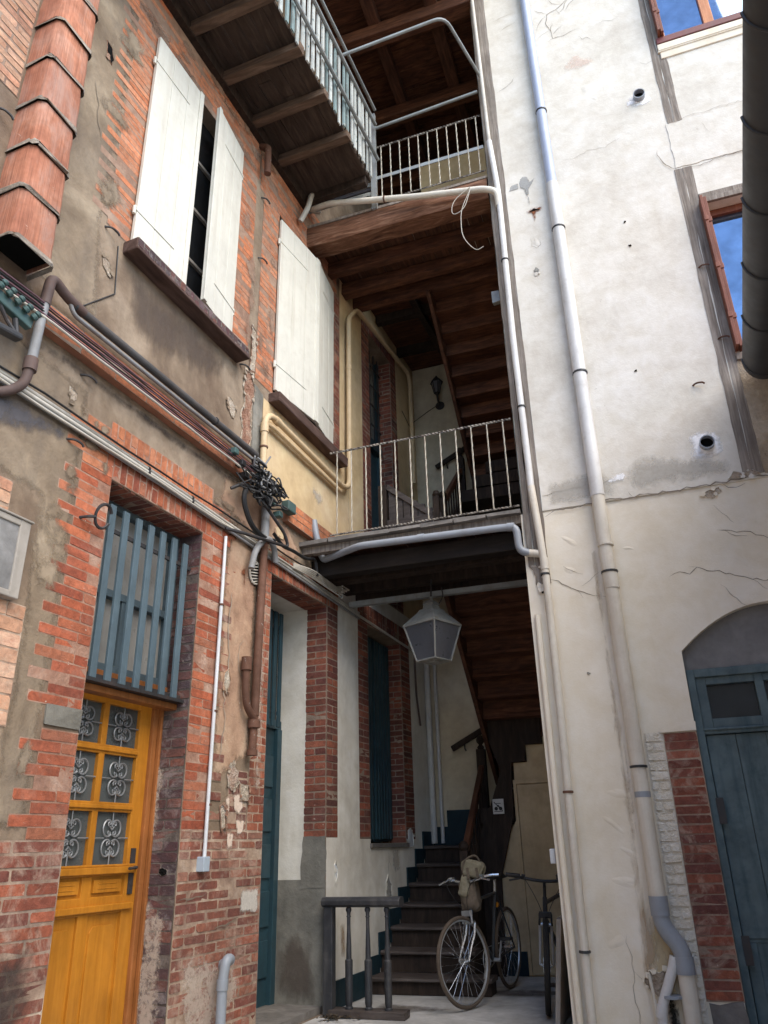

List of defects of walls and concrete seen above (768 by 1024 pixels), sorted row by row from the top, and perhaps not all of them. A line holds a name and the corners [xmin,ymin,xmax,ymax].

crack [536,0,617,41]
flaking render [510,177,533,201]
spalling [226,324,258,445]
leakage [552,478,590,500]
crack [545,475,768,515]
crack [674,567,767,606]
spalling [219,760,251,848]